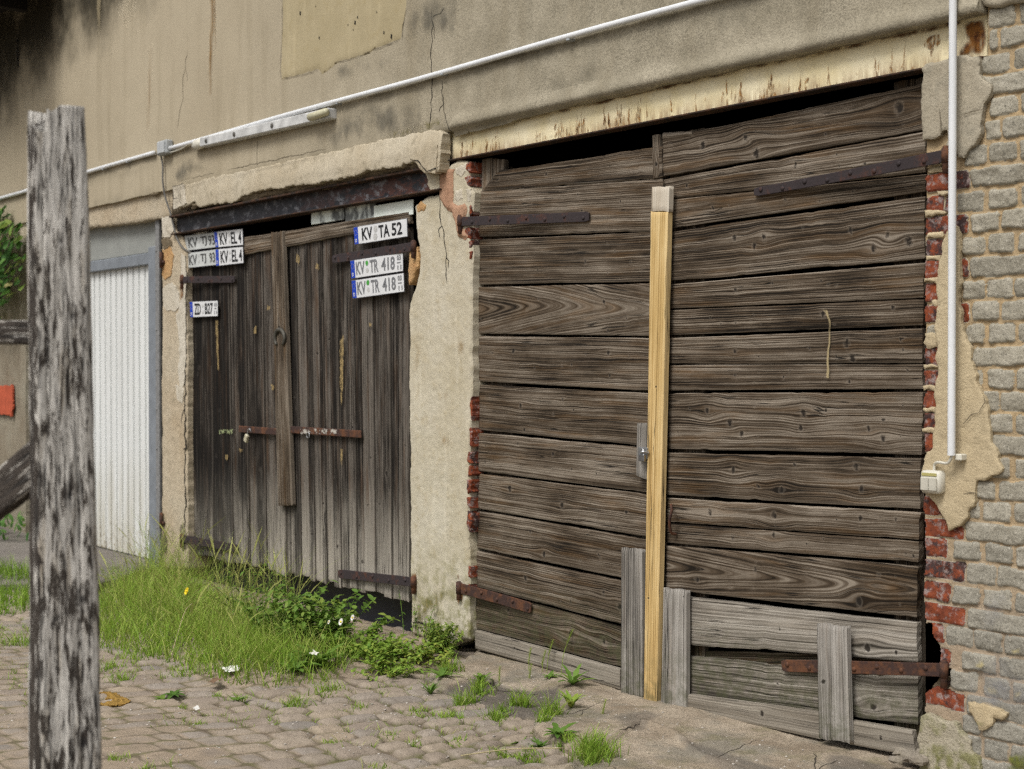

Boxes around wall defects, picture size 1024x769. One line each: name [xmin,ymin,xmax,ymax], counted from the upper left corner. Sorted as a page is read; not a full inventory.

crack [429,9,454,134]
peeling [921,55,994,158]
flaking render [465,162,482,187]
crack [438,198,449,281]
flaking render [465,205,483,259]
peeling [922,225,1005,531]
flaking render [466,396,484,532]
flaking render [468,566,480,588]